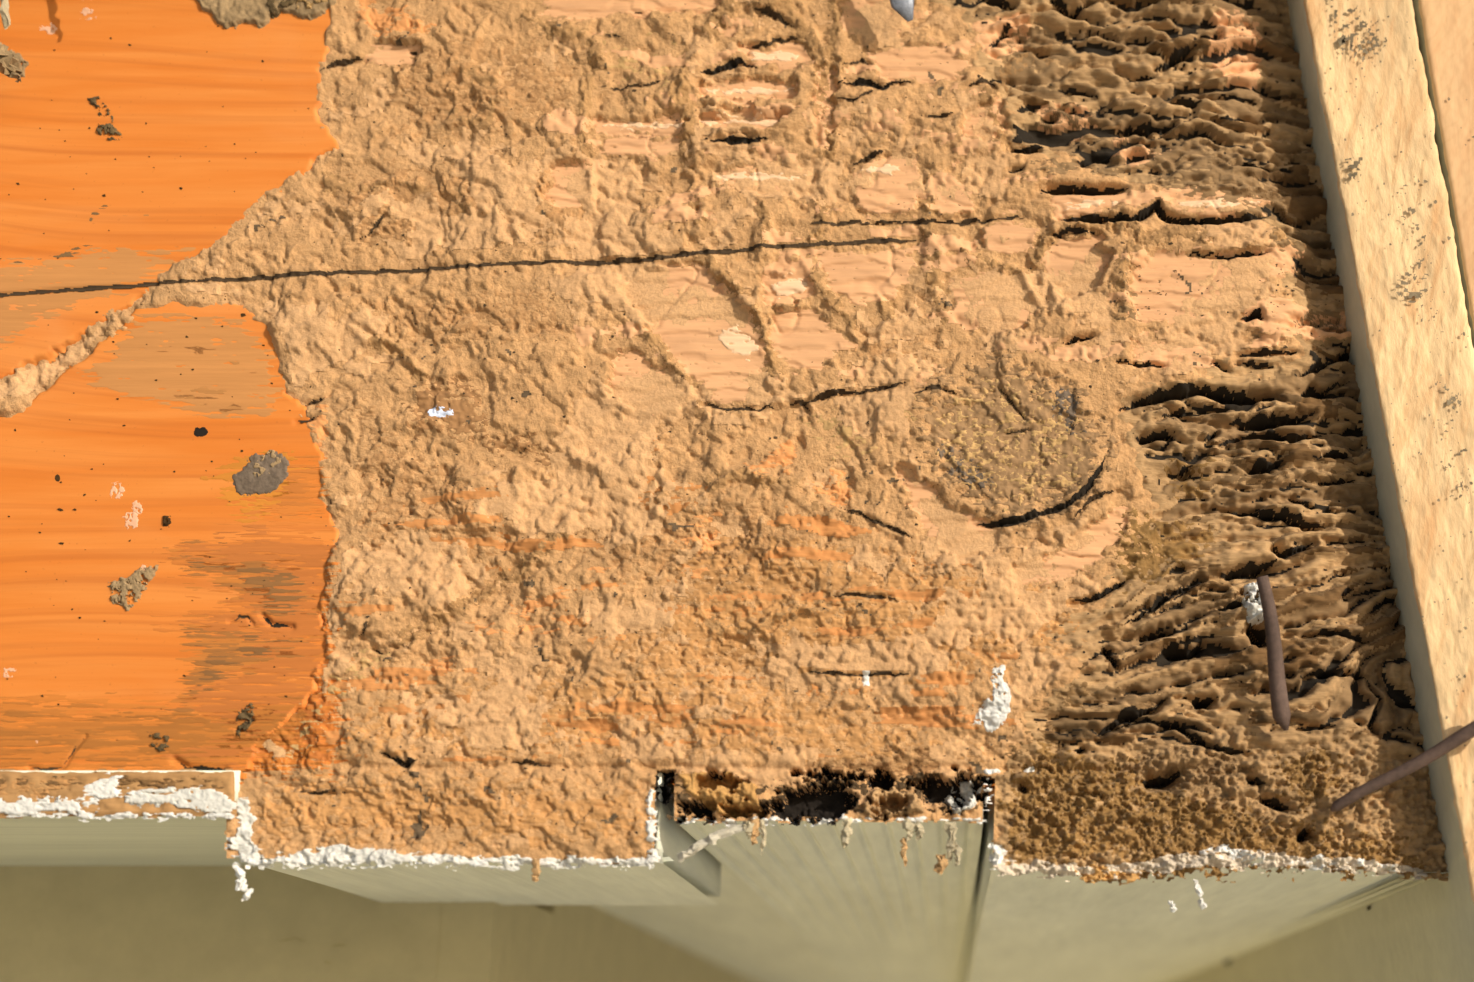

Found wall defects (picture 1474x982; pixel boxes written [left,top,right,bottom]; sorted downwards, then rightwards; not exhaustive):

peeling [364,44,421,71]
peeling [543,160,590,216]
peeling [538,0,722,21]
crack [0,0,1334,297]
peeling [589,42,839,162]
peeling [607,248,918,409]
crack [705,381,957,440]
peeling [853,0,1415,747]
crack [841,466,921,538]
crack [966,308,1423,842]
crack [794,670,909,707]
crack [380,721,465,846]